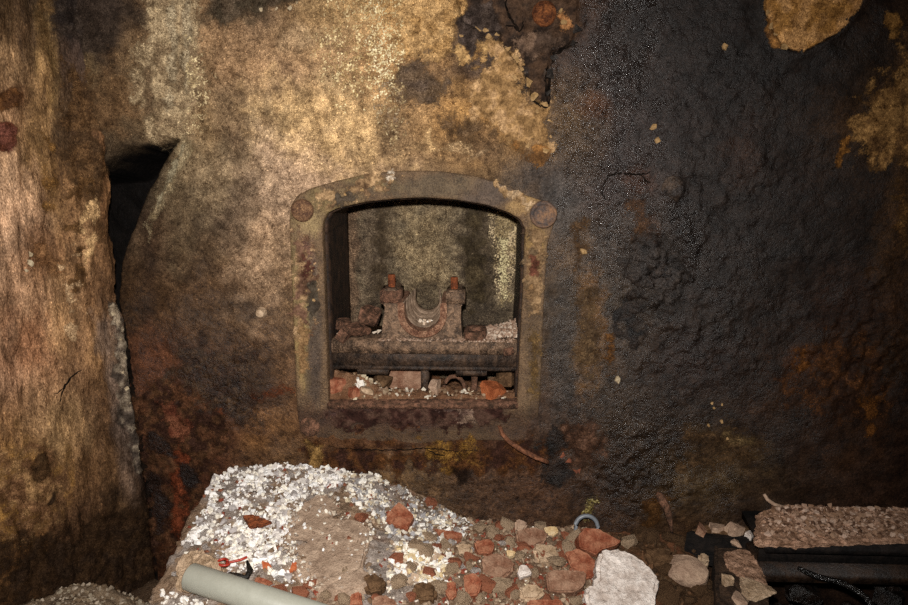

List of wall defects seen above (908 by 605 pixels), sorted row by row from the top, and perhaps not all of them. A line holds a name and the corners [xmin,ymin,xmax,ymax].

flaking render [394,0,583,168]
damp [834,12,908,171]
crack [54,370,82,402]
corrosion [130,377,231,571]
damp [534,427,574,488]